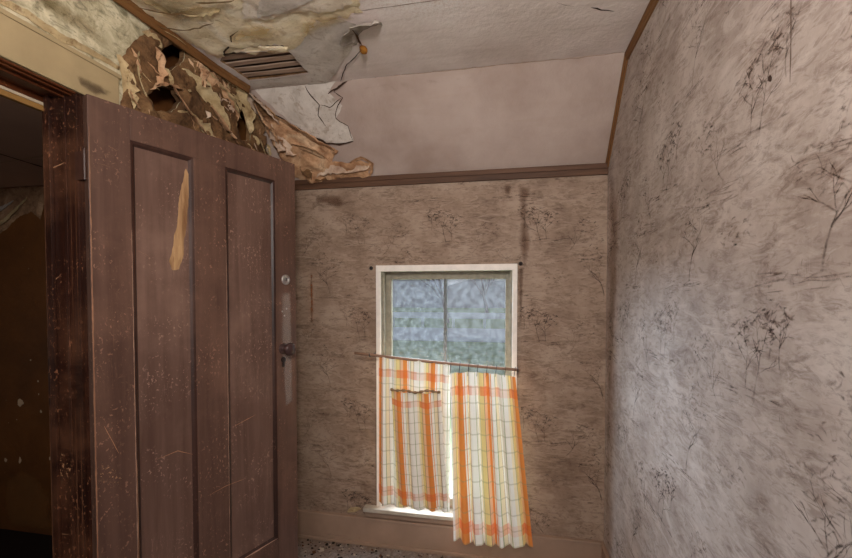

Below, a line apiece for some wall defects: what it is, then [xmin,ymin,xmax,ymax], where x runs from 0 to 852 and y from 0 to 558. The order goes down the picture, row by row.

crack [787,0,795,74]
spalling [0,0,382,181]
peeling [0,186,44,233]